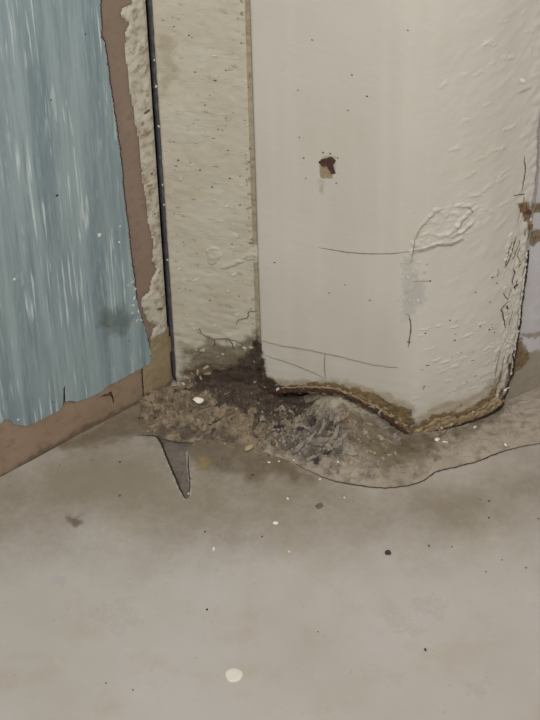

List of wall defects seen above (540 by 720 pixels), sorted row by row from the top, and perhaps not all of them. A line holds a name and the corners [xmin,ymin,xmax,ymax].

spalling [100,0,142,322]
crack [323,239,464,254]
crack [503,129,540,403]
crack [196,310,258,356]
crack [262,340,398,379]
leakage [18,338,439,478]
peeling [313,449,340,473]
flaking render [303,395,401,462]